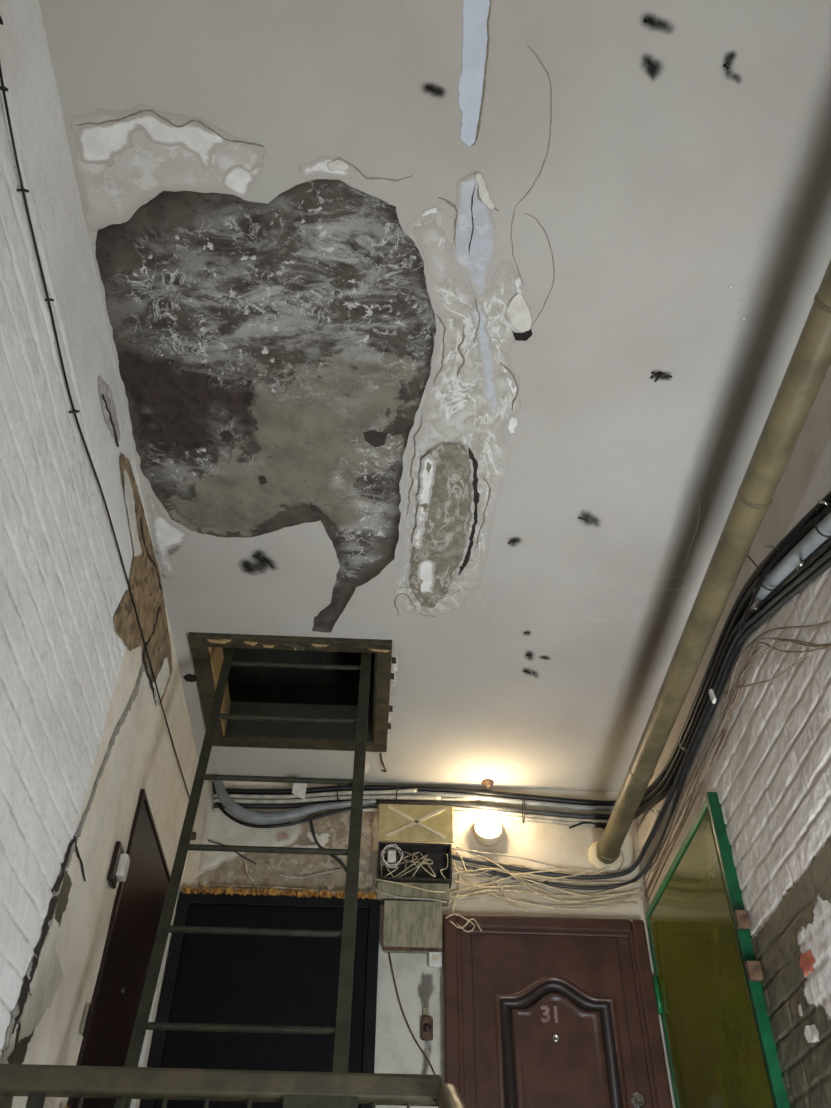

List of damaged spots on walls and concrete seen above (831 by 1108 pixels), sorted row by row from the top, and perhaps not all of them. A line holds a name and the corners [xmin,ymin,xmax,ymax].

peeling [458,0,491,147]
crack [510,45,555,327]
flaking render [71,105,532,707]
peeling [797,893,831,1043]